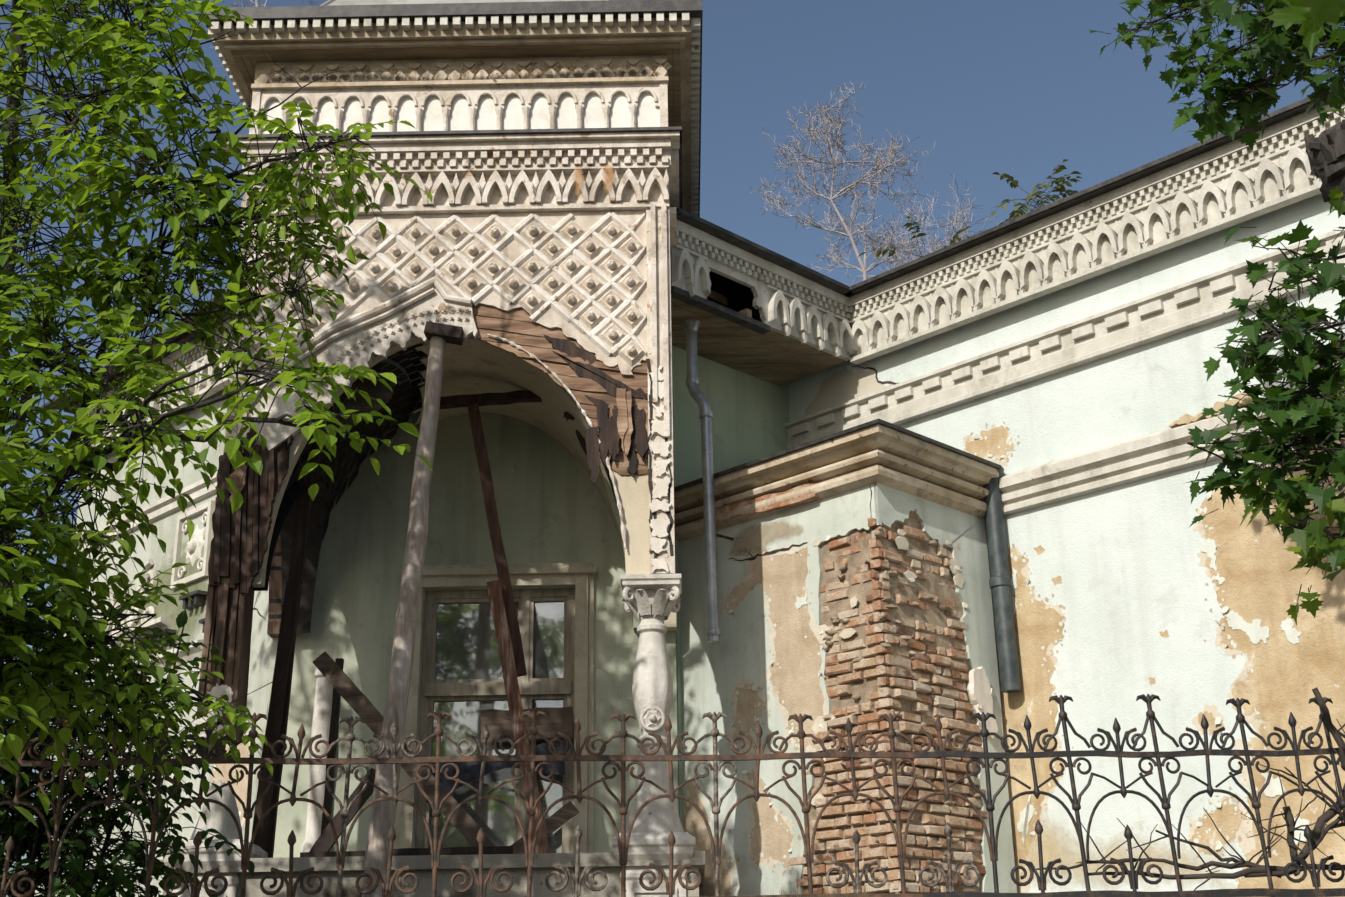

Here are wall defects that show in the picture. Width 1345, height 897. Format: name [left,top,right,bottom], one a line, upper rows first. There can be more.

crack [852,366,898,384]
flaking render [564,412,617,505]
flaking render [646,359,674,574]
peeling [963,421,1020,467]
crack [730,542,807,561]
flaking render [683,511,1074,897]
peeling [1186,426,1345,897]